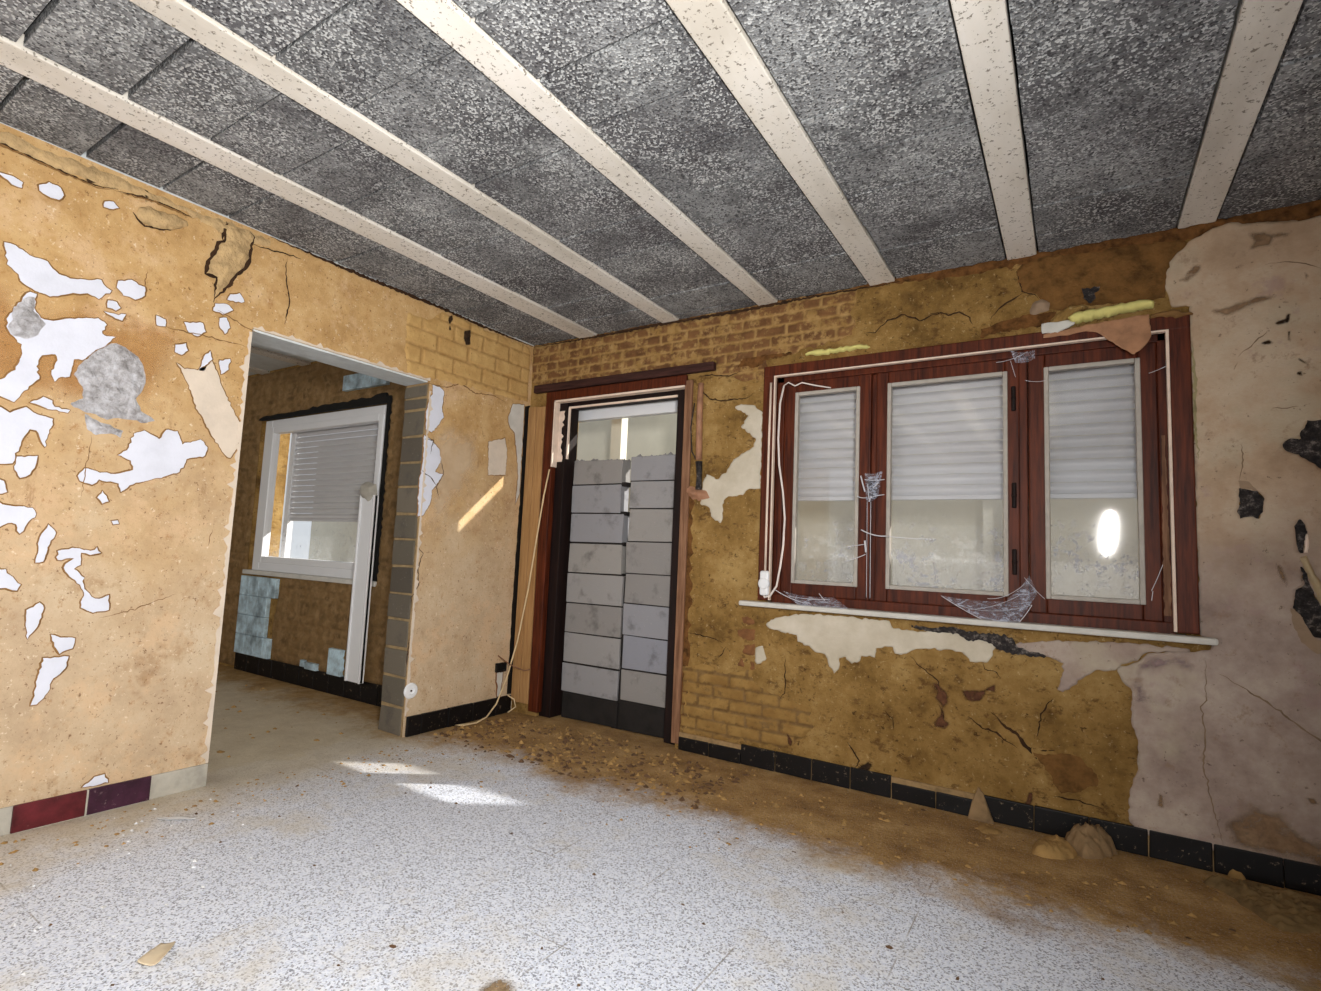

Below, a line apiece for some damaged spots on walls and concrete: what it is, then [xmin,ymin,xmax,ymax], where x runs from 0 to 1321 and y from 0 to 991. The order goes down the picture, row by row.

flaking render [0,132,1321,763]
peeling [80,773,109,788]
crack [910,656,1054,759]
flaking render [1031,748,1102,797]
crack [1056,796,1102,819]
crack [1200,661,1321,840]